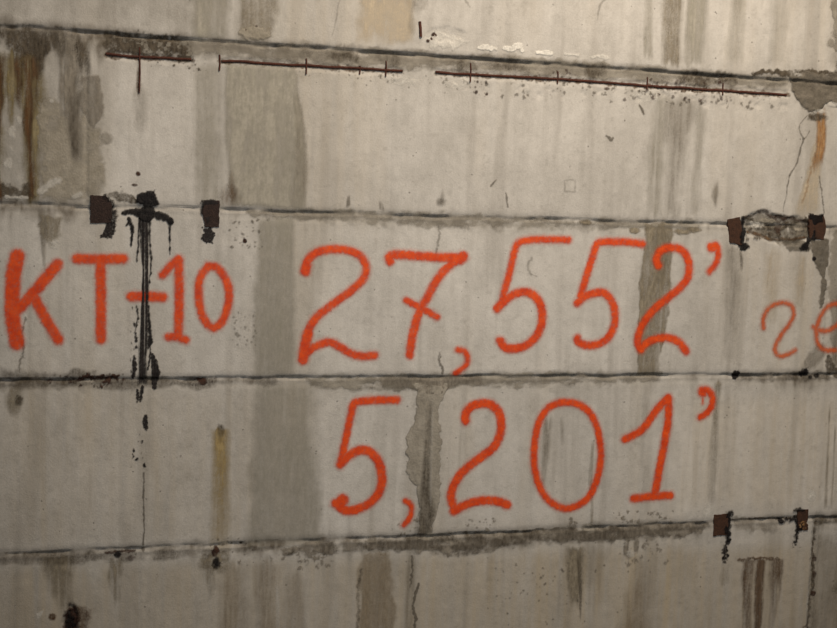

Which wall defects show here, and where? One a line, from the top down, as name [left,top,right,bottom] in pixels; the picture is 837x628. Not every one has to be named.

rust [0,48,43,202]
rust [799,113,826,209]
spalling [744,210,811,245]